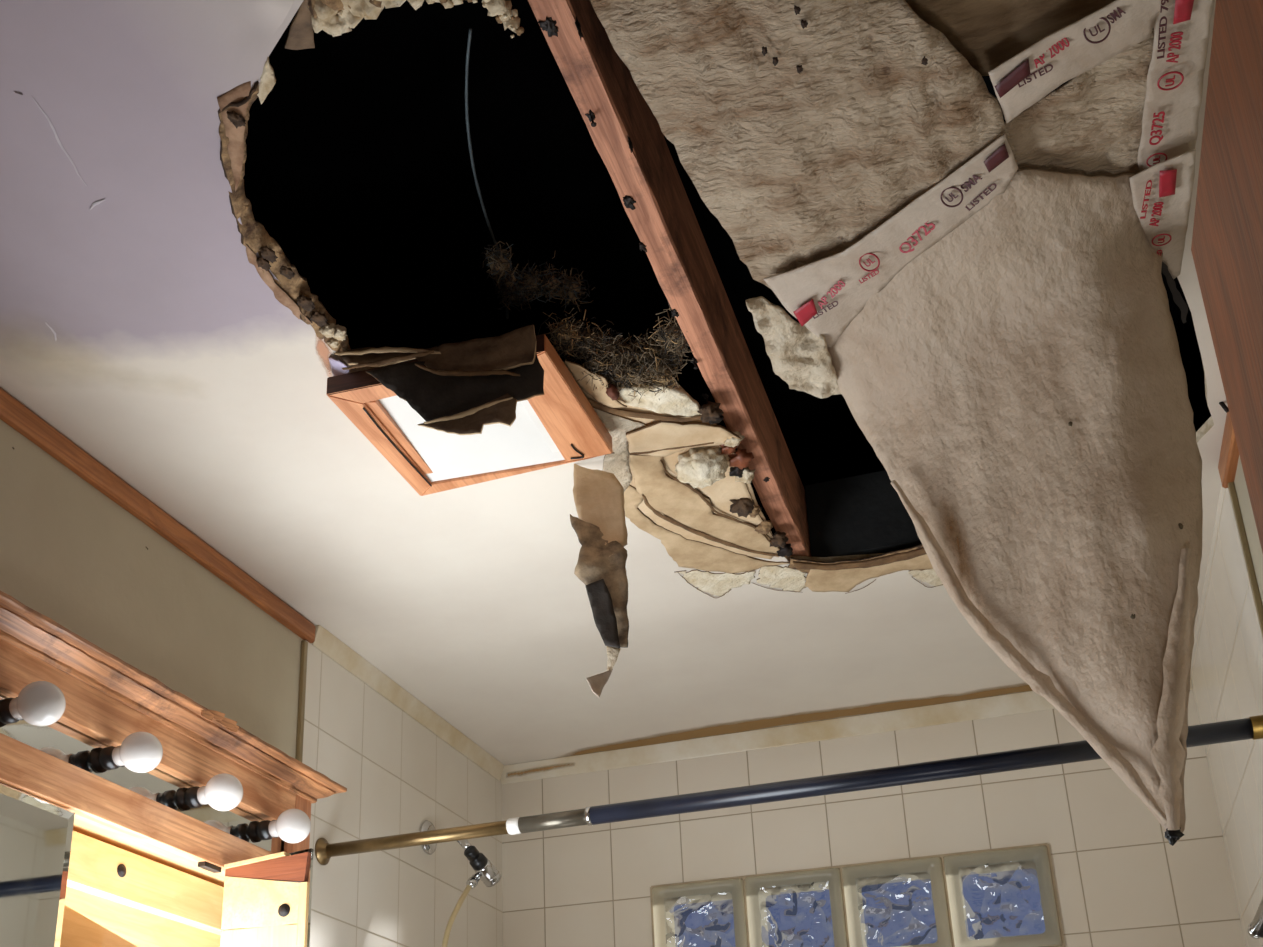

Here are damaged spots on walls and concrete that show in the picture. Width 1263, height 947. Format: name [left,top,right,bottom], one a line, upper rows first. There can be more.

spalling [285,0,524,50]
crack [15,92,105,210]
spalling [217,57,351,376]
spalling [674,544,943,598]